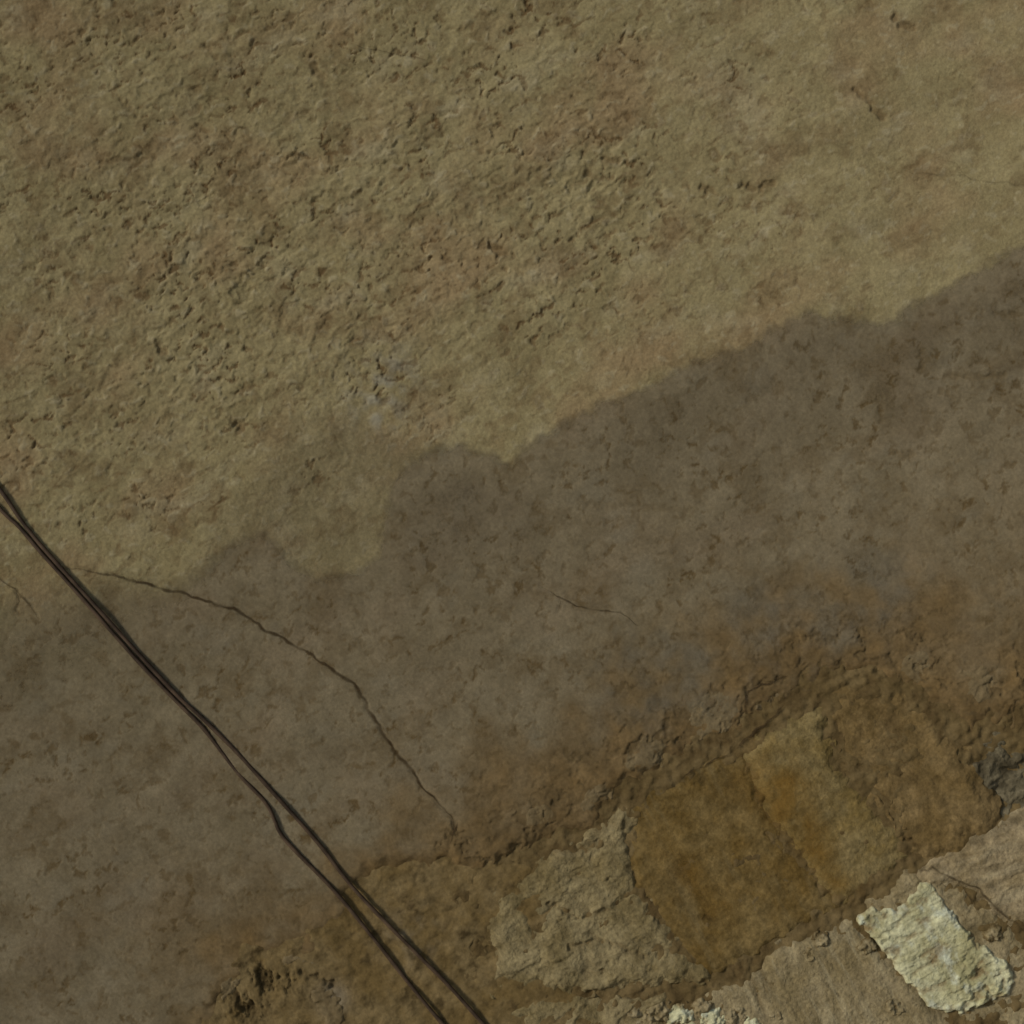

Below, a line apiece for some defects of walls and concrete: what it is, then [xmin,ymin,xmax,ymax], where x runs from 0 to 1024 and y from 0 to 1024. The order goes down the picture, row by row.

crack [115,575,458,837]
damp [0,248,1024,1024]
spalling [201,648,1024,1024]